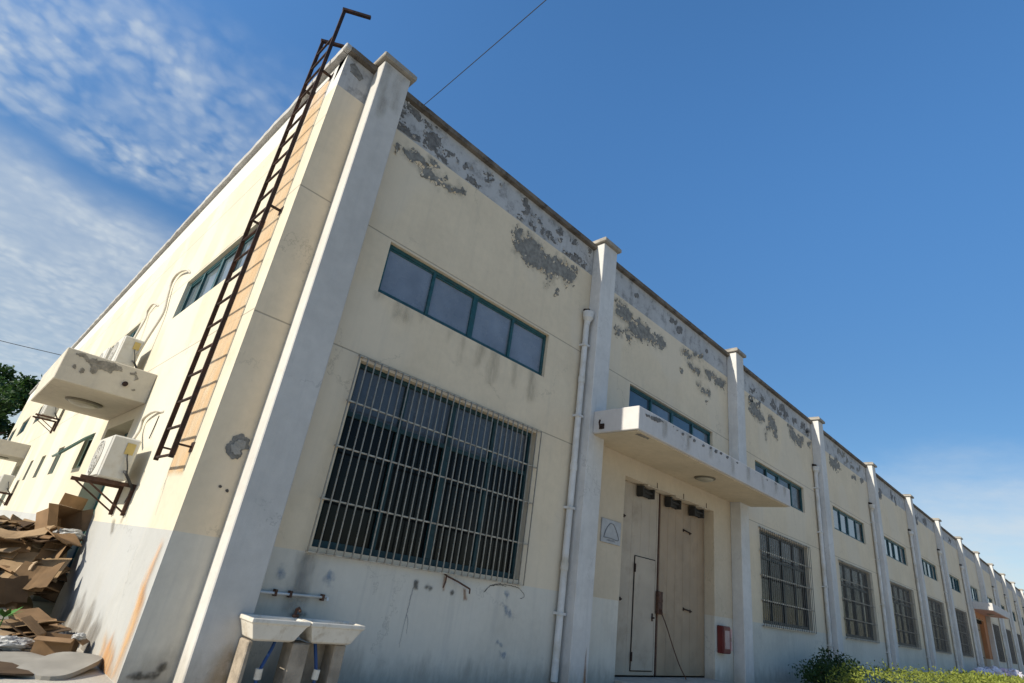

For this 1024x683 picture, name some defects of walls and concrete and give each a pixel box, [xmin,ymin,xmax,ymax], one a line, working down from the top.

peeling [393,101,503,196]
peeling [511,197,592,298]
peeling [614,293,666,350]
spalling [72,353,139,391]
peeling [225,434,250,459]
peeling [748,388,811,448]
rust [99,588,143,675]